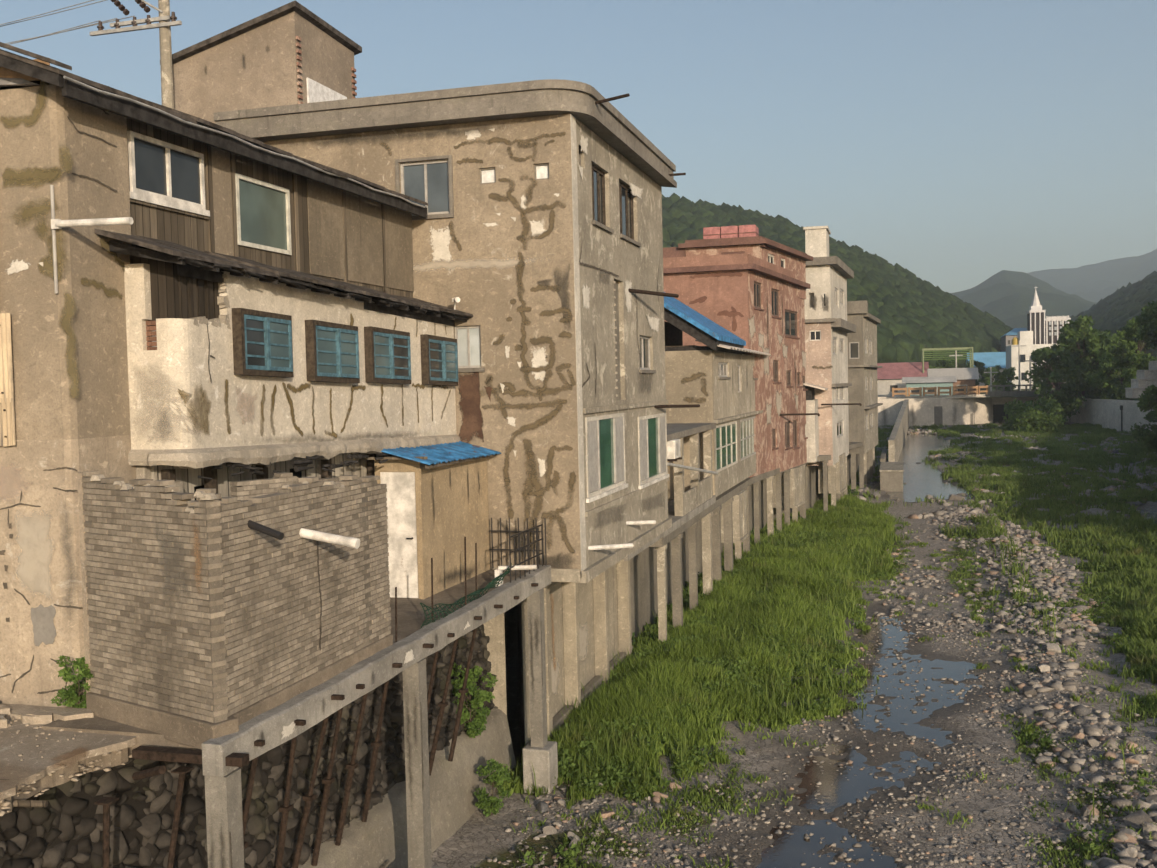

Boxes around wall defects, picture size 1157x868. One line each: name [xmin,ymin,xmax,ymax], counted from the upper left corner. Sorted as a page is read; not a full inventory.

leakage [2,147,73,182]
spalling [5,259,43,275]
leakage [35,221,65,271]
crack [449,222,462,251]
peeling [413,226,527,271]
crack [579,247,659,361]
crack [689,272,744,331]
crack [454,132,597,553]
crack [681,372,708,403]
crack [0,467,78,523]
spalling [31,604,56,646]
crack [0,655,68,694]